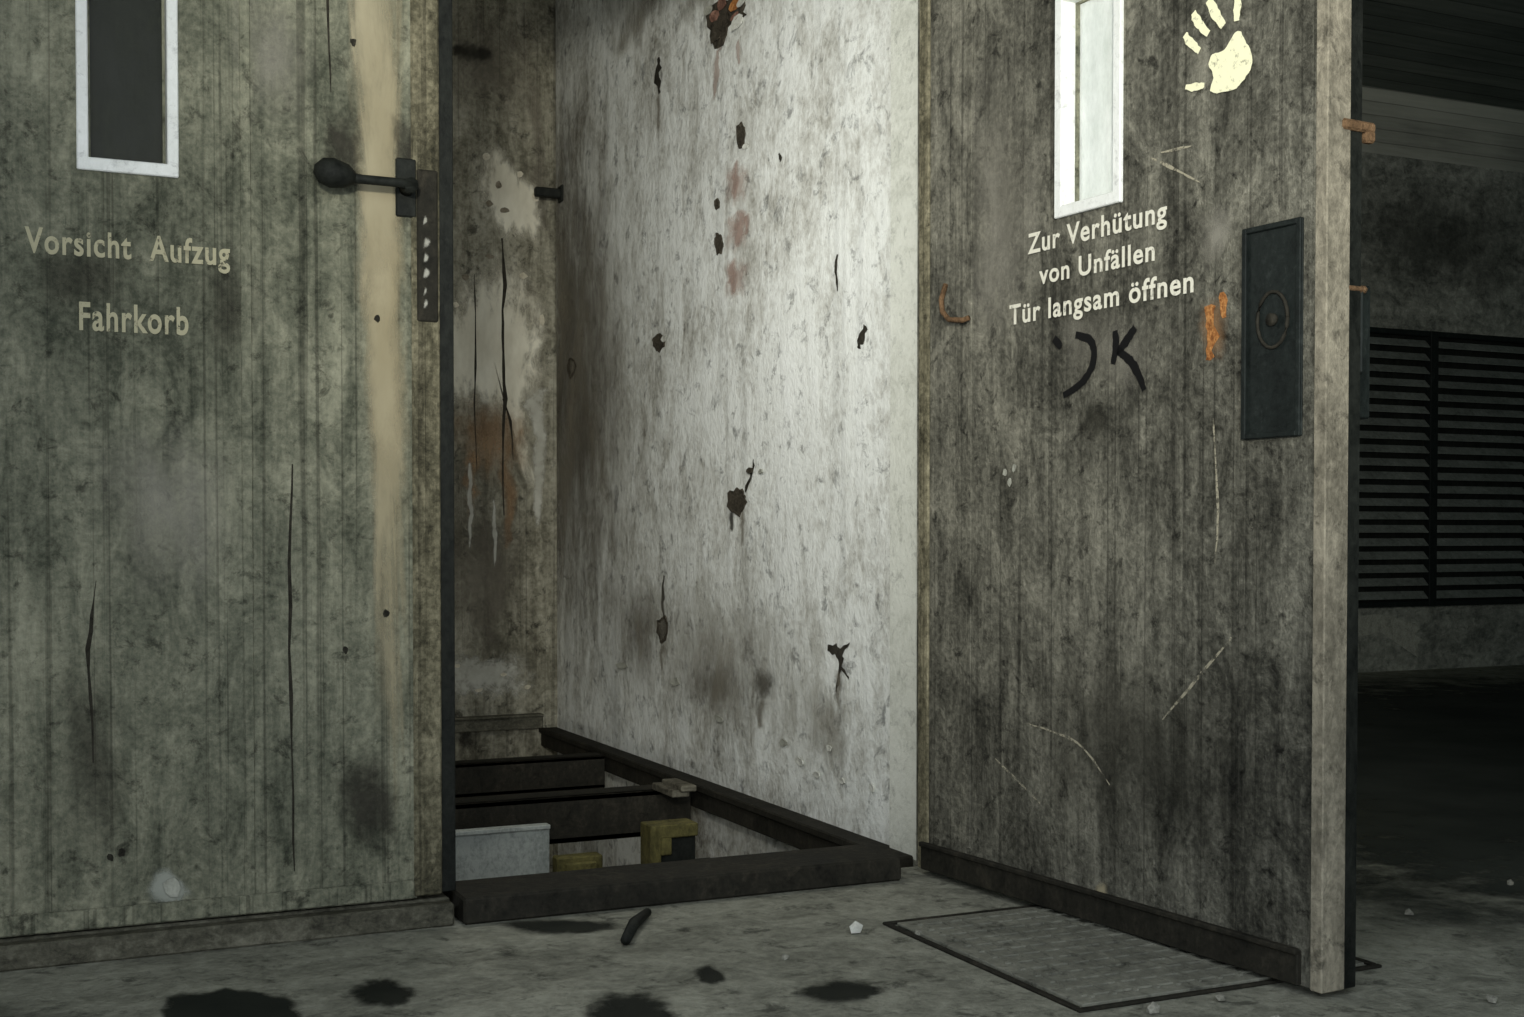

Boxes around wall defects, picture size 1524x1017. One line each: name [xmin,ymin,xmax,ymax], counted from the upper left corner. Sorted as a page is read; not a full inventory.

leakage [455,659,531,694]